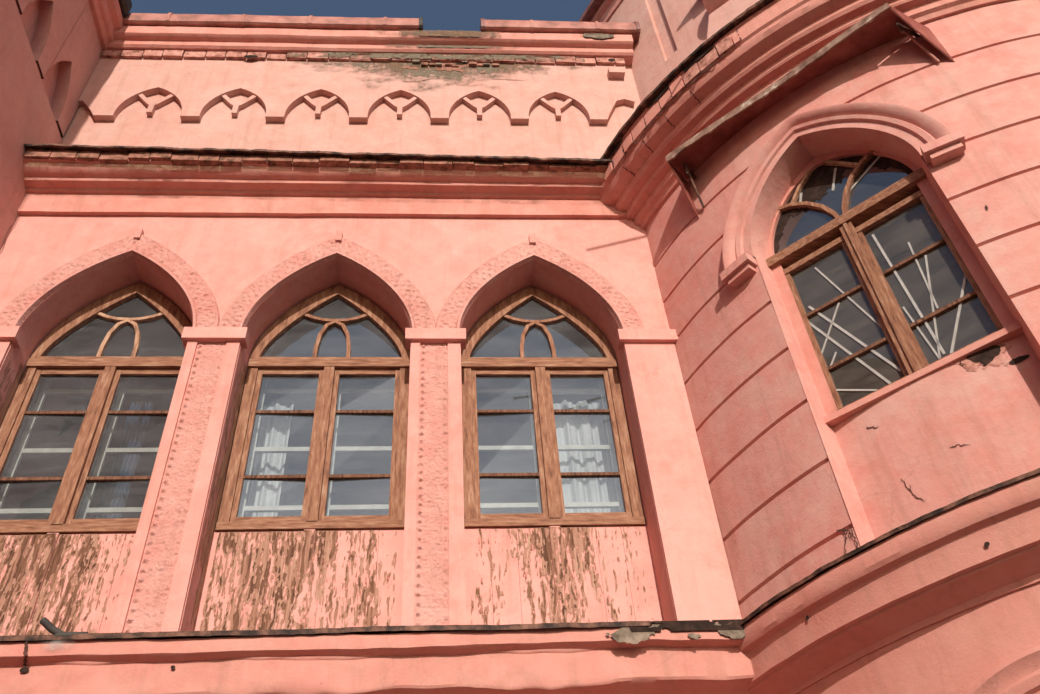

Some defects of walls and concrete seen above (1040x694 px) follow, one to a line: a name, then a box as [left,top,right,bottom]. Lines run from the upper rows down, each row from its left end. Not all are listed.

damp [319,30,564,90]
flaking render [954,342,1030,372]
peeling [0,359,24,427]
peeling [187,364,400,631]
crack [836,527,858,554]
peeling [0,533,134,636]
peeling [470,526,746,644]